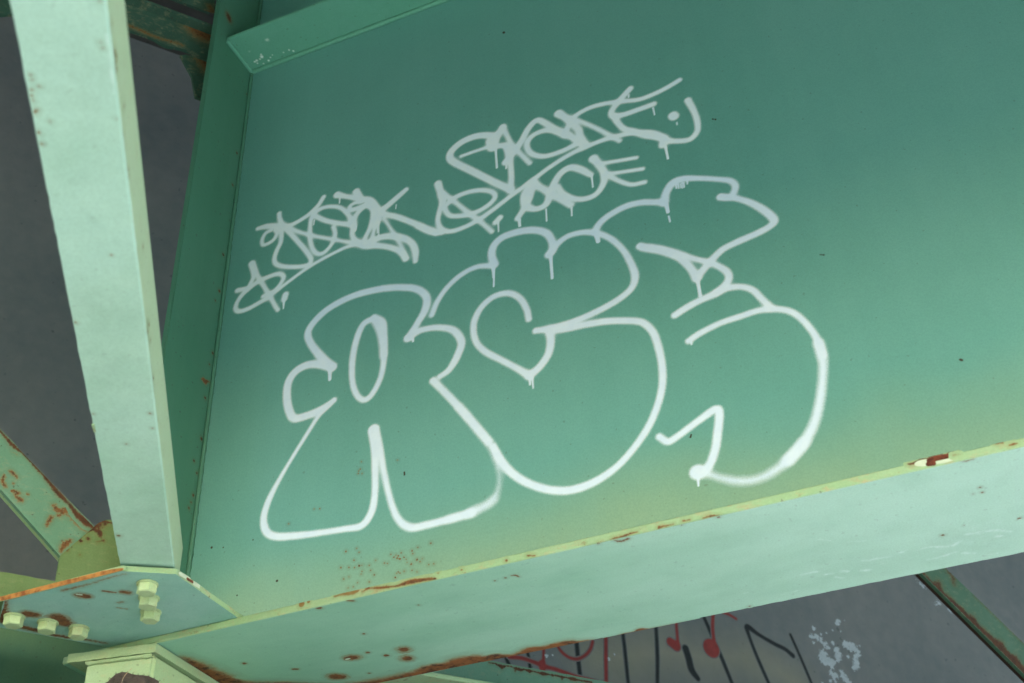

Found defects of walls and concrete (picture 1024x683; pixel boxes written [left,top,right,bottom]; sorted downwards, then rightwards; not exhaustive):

corrosion [94,16,118,74]
corrosion [127,21,211,79]
corrosion [0,429,125,559]
peeling [914,450,964,466]
corrosion [0,565,136,646]
corrosion [295,539,442,611]
corrosion [173,618,699,683]
corrosion [922,568,1024,674]